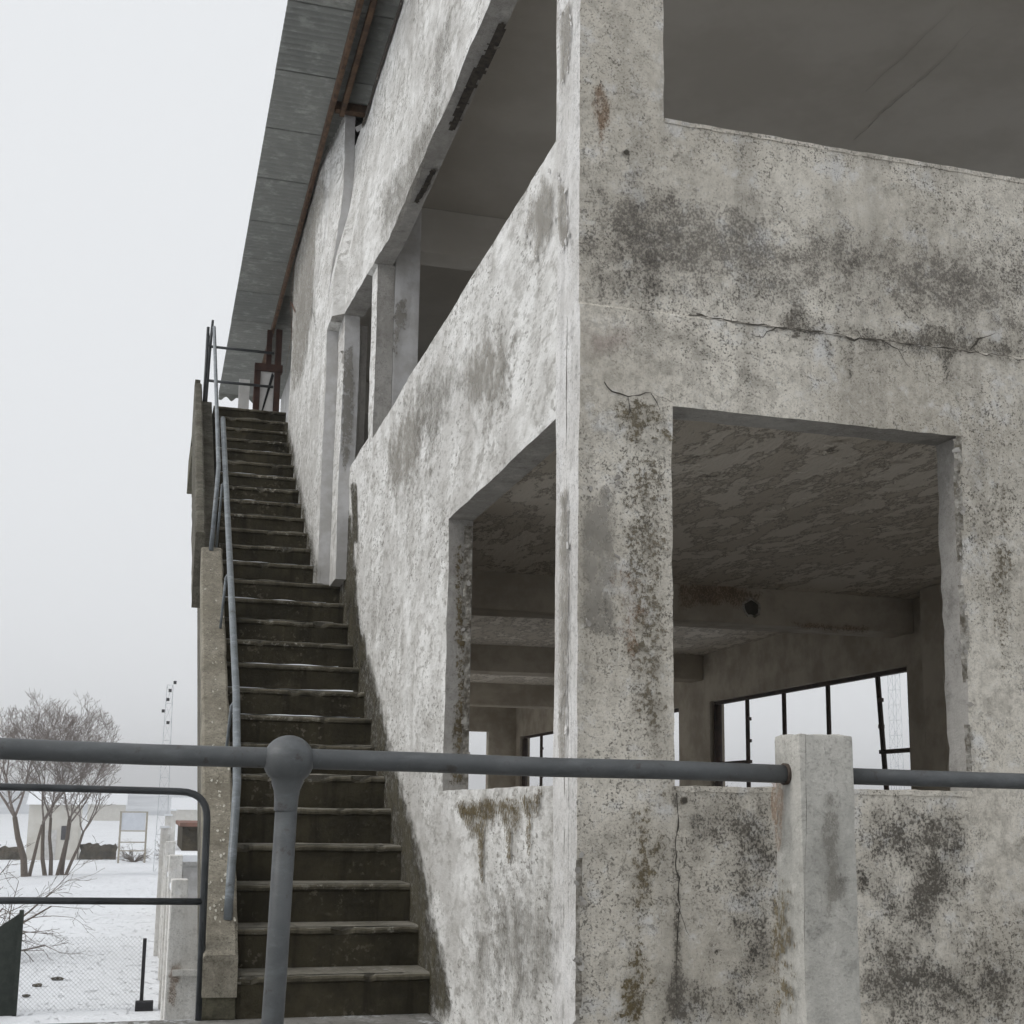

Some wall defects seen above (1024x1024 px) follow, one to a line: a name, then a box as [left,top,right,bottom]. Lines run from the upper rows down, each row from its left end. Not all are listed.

spalling [449,22,506,131]
rust [595,84,609,139]
water stain [580,168,1024,379]
crack [688,314,1023,366]
crack [604,382,670,422]
crack [675,793,689,1013]
mould [856,795,1024,1024]